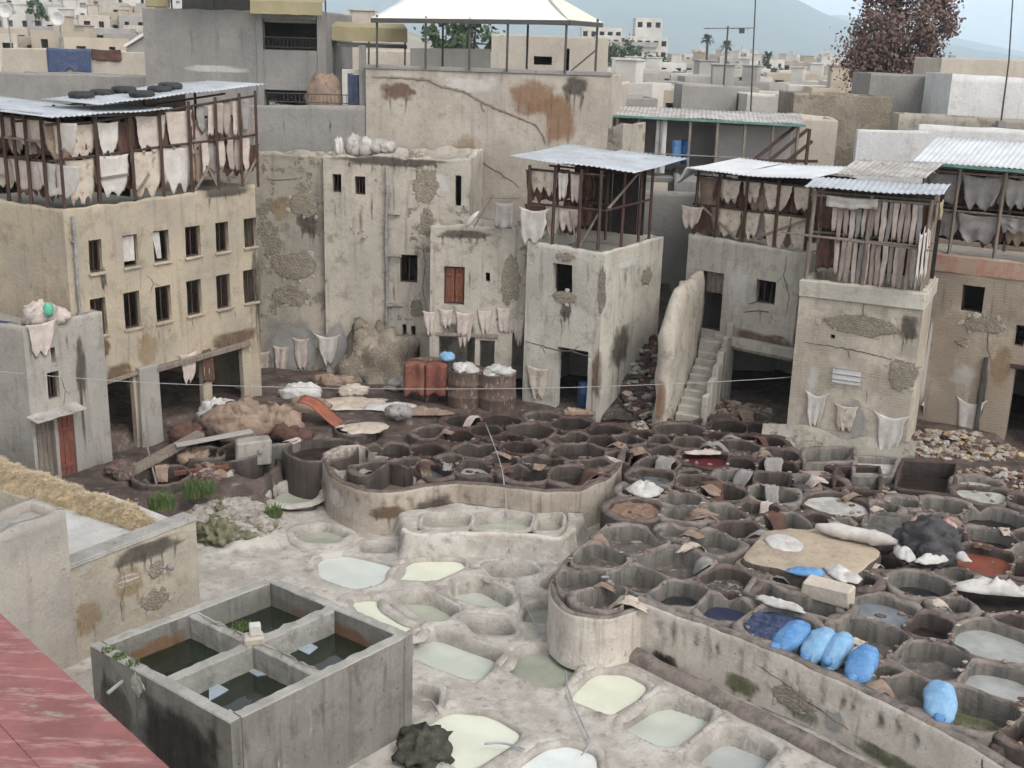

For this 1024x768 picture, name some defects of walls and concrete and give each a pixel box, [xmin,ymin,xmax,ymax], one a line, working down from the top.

damp [384,83,416,103]
crack [373,76,546,144]
damp [564,78,587,105]
flaking render [285,191,318,220]
flaking render [411,166,441,239]
flaking render [266,251,321,307]
flaking render [499,252,522,308]
flaking render [816,310,904,340]
flaking render [955,312,1007,348]
flaking render [886,357,923,393]
damp [117,536,179,588]
flaking render [134,560,173,616]